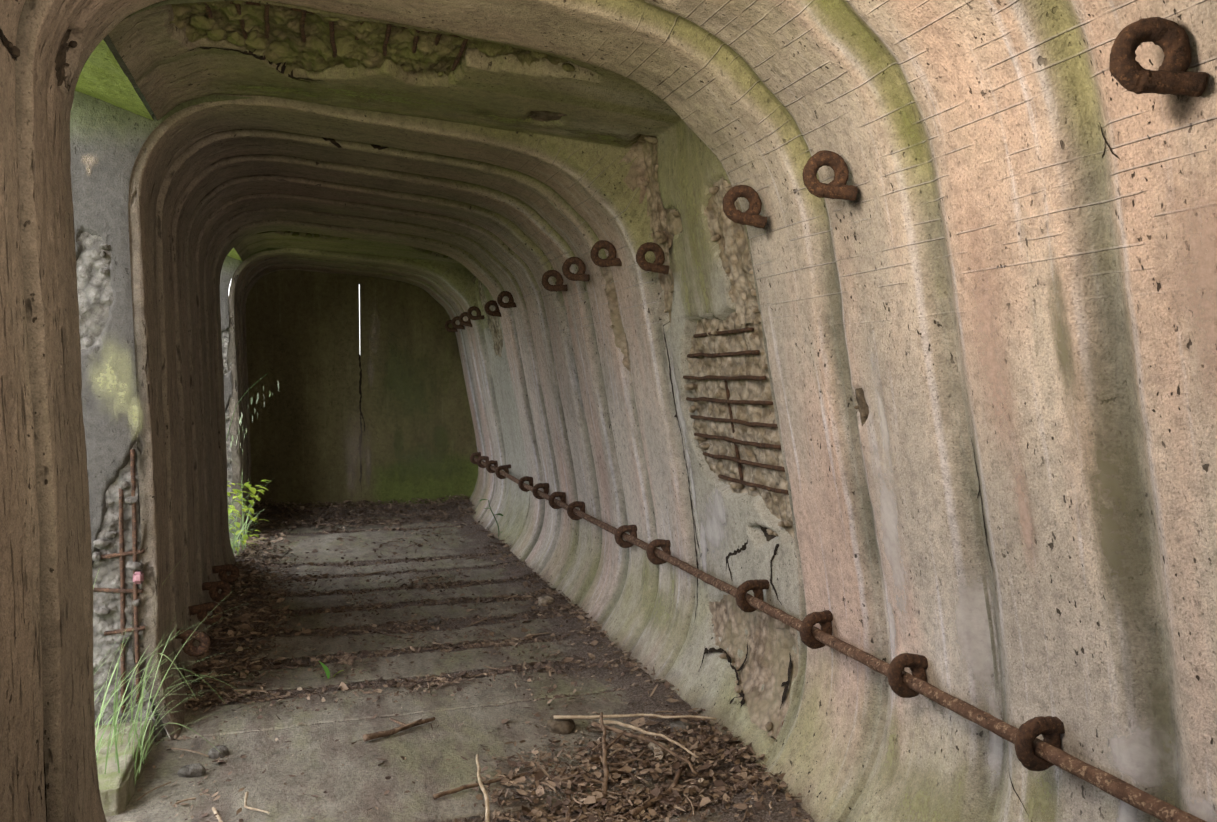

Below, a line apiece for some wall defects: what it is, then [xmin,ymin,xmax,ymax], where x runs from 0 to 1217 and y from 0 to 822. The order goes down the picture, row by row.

corrosion [1170,94,1192,121]
spalling [619,134,684,323]
crack [357,354,365,491]
crack [663,321,782,707]
spalling [683,176,795,542]
crack [780,654,792,709]